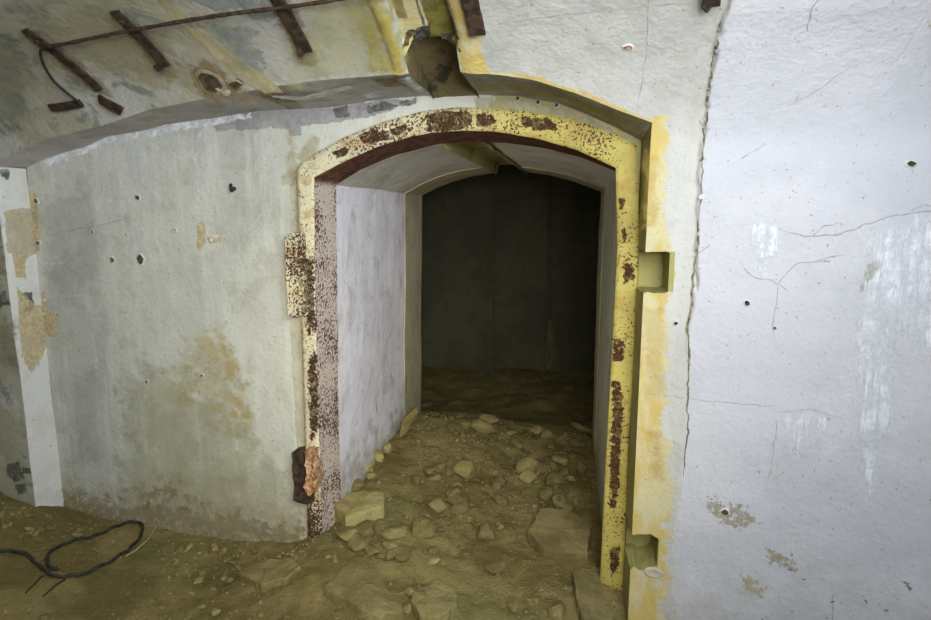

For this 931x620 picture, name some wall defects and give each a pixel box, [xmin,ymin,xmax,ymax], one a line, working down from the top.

rust [359,123,413,145]
rust [425,110,497,133]
rust [521,116,558,131]
rust [333,147,349,158]
rust [623,263,635,284]
rust [306,258,317,336]
rust [611,338,625,362]
rust [307,350,321,443]
rust [608,380,625,510]
rust [609,545,621,576]